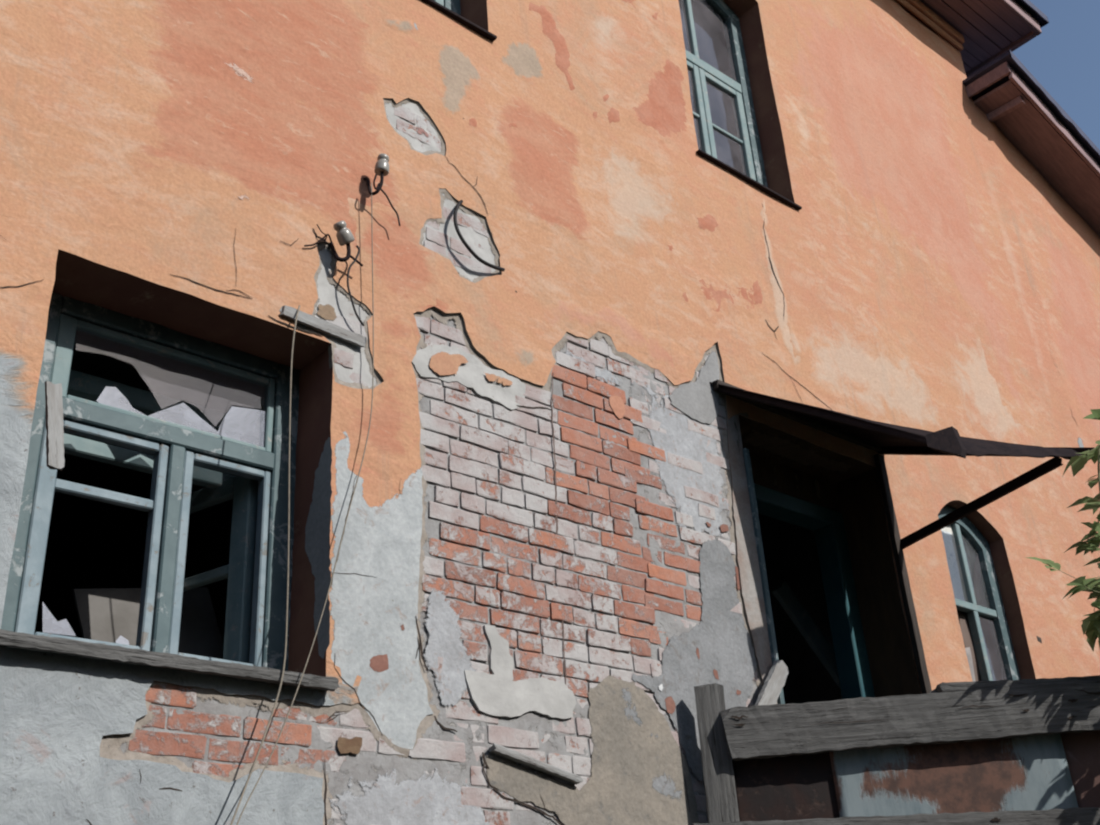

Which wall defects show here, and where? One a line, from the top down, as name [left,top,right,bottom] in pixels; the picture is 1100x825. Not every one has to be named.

flaking render [383,40,481,156]
flaking render [501,2,575,91]
peeling [583,54,692,258]
crack [171,230,323,337]
flaking render [294,243,382,389]
flaking render [419,189,500,283]
crack [762,204,832,410]
flaking render [0,308,772,825]